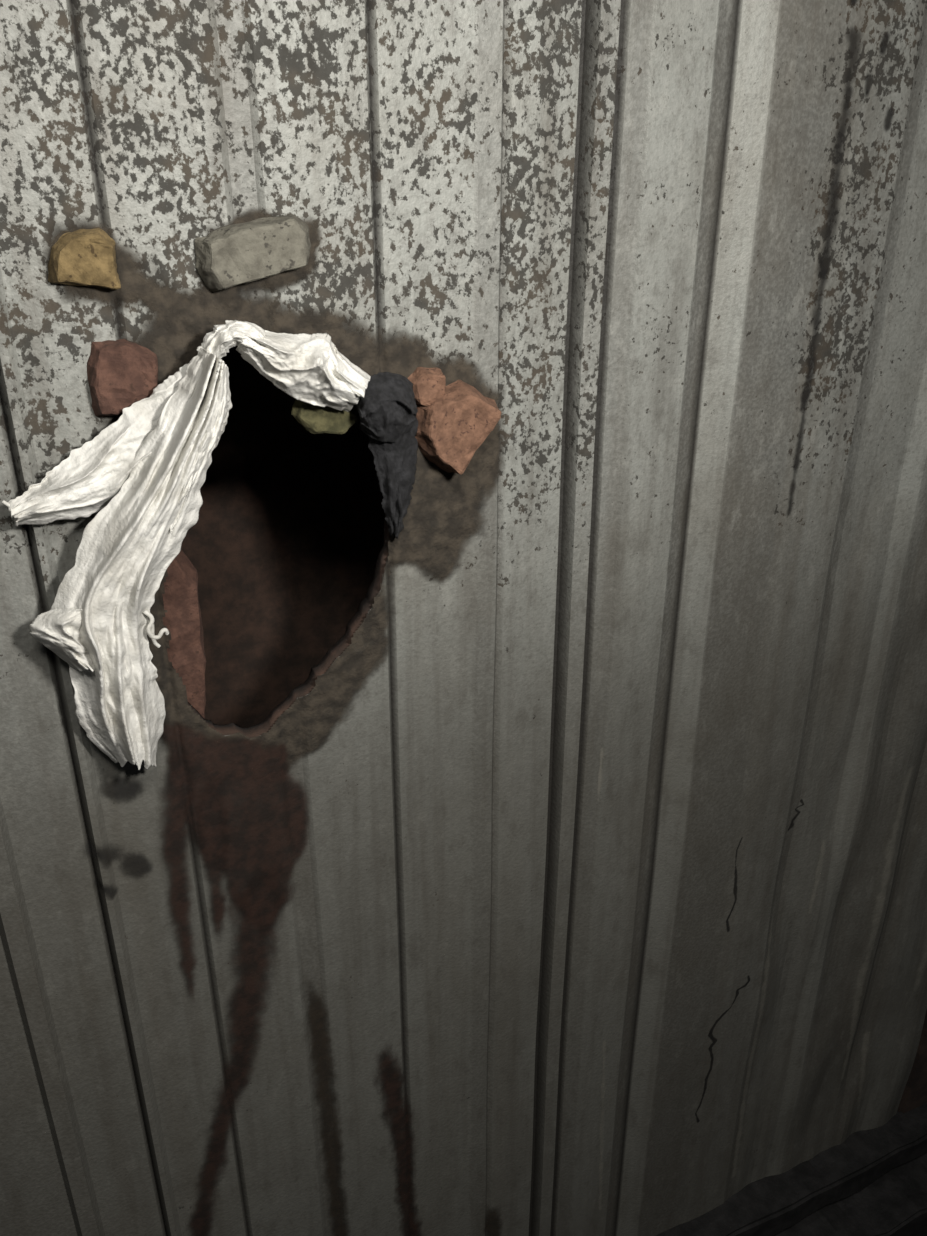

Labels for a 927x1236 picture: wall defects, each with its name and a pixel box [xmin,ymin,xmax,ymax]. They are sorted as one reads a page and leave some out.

corrosion [885,108,893,129]
corrosion [788,30,873,515]
crack [726,838,742,931]
corrosion [162,724,308,1236]
corrosion [309,994,347,1236]
corrosion [380,1052,420,1236]
crack [696,975,750,1122]